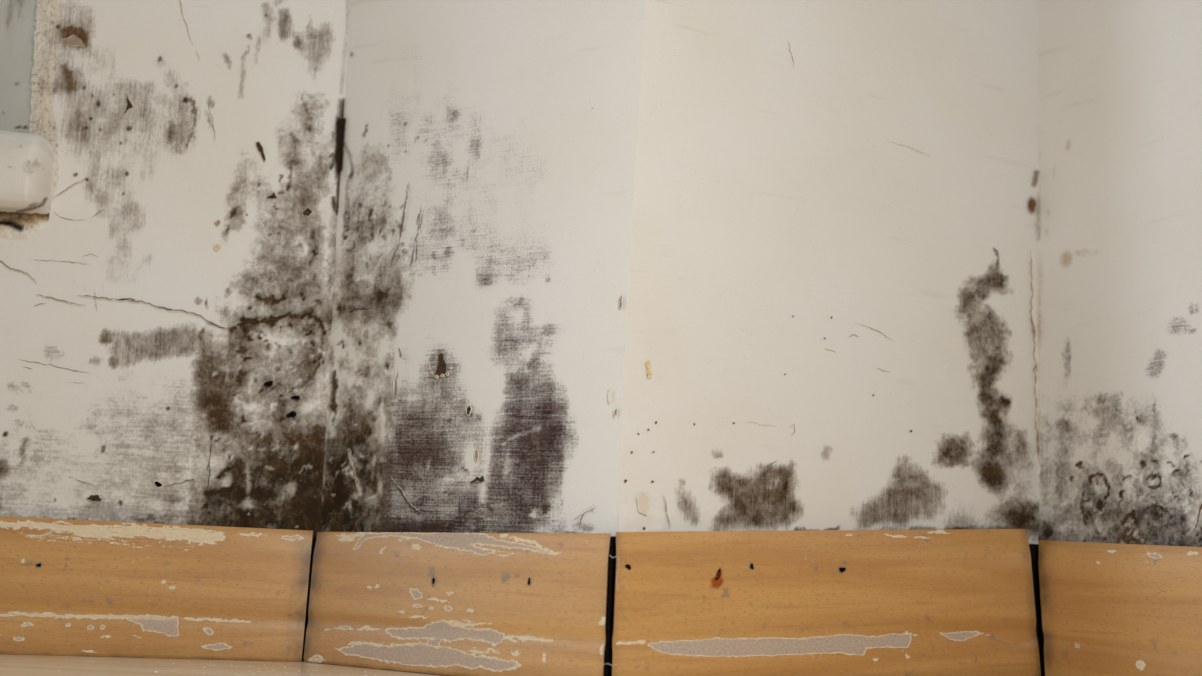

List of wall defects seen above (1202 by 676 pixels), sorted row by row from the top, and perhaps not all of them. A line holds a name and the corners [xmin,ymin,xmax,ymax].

water stain [56,24,90,48]
water stain [53,64,132,144]
water stain [167,85,210,152]
flaking render [0,211,50,240]
crack [55,179,104,220]
crack [0,254,232,331]
water stain [100,100,573,538]
water stain [860,248,1202,547]
water stain [0,459,9,477]
water stain [715,465,805,531]
peeling [81,625,111,653]
peeling [201,627,232,651]